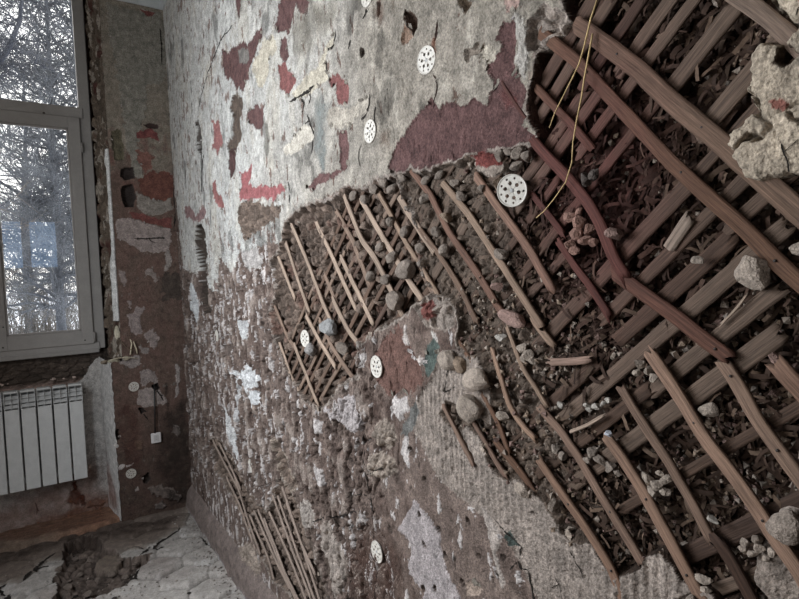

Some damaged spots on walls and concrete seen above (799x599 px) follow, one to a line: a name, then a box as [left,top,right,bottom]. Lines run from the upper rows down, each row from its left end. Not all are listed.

spalling [502,159,530,197]
spalling [388,227,412,261]
spalling [384,262,400,288]
spalling [535,226,608,324]
spalling [526,299,635,399]
spalling [600,361,656,407]
spalling [565,409,600,440]
spalling [208,344,350,599]
crack [0,553,55,599]
crack [113,528,180,590]
peeling [398,500,482,599]
spalling [691,557,744,599]